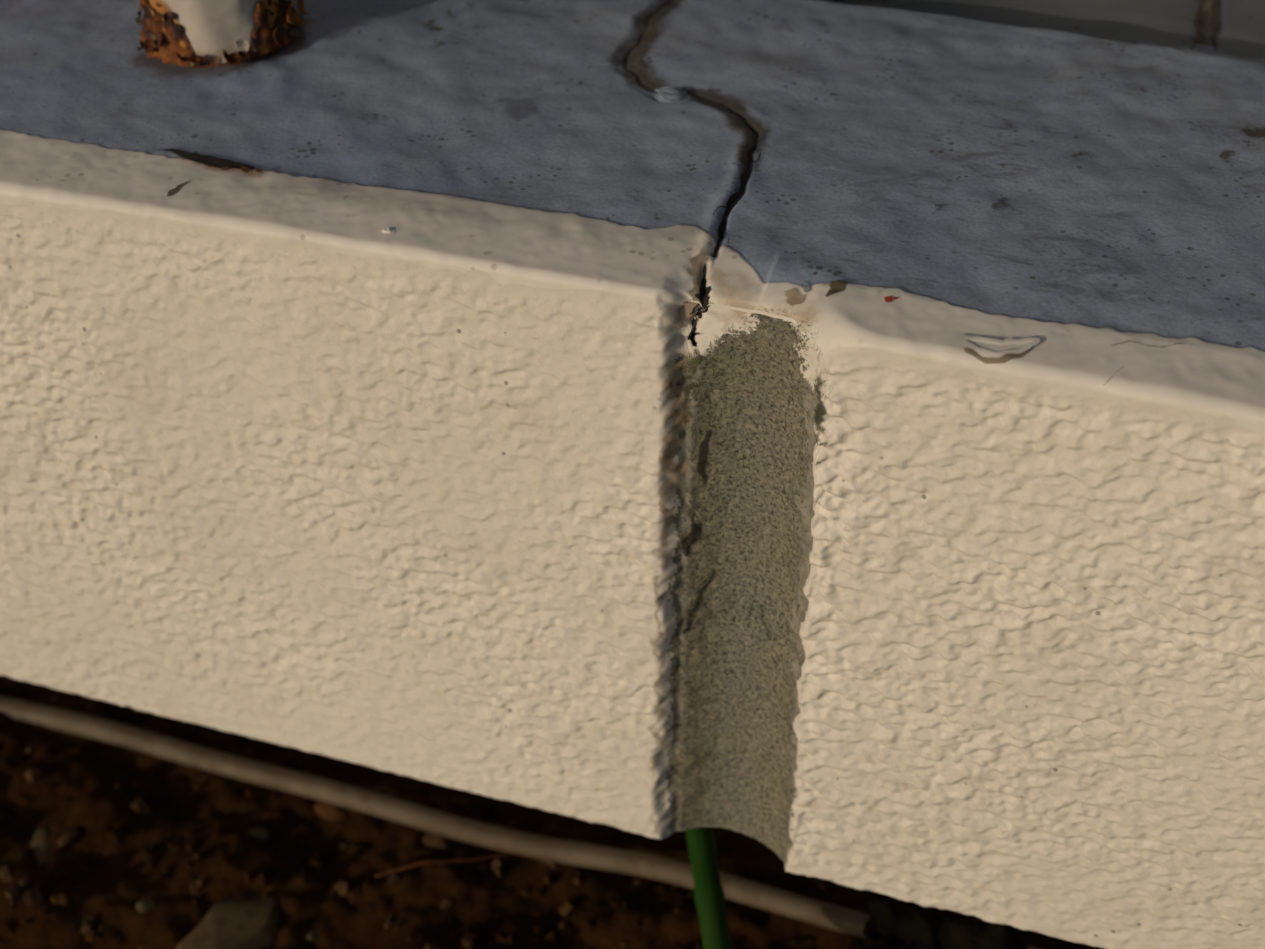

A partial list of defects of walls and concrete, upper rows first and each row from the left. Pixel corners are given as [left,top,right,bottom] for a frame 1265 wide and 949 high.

rust [135,0,307,68]
spalling [160,148,262,176]
crack [624,0,761,339]
peeling [955,334,1040,364]